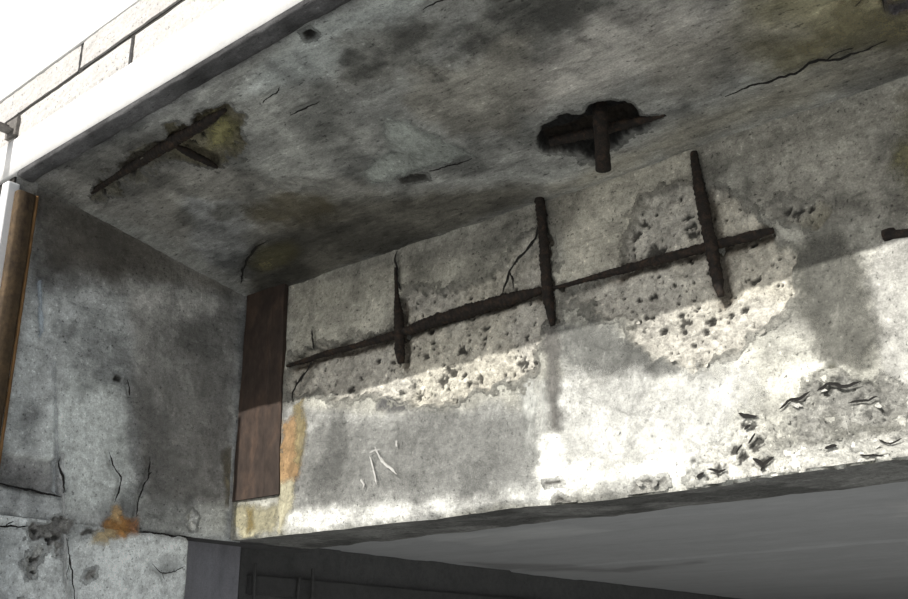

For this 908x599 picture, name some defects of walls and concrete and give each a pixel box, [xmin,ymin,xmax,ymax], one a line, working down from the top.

crack [725,40,887,97]
spalling [87,102,251,204]
spalling [532,98,666,166]
rust [246,193,332,222]
spalling [283,150,837,413]
damp [799,235,908,385]
crack [0,520,26,528]
crack [0,459,65,497]
rust [93,506,138,542]
crack [109,452,188,538]
rust [223,400,307,538]
peeling [627,367,908,495]